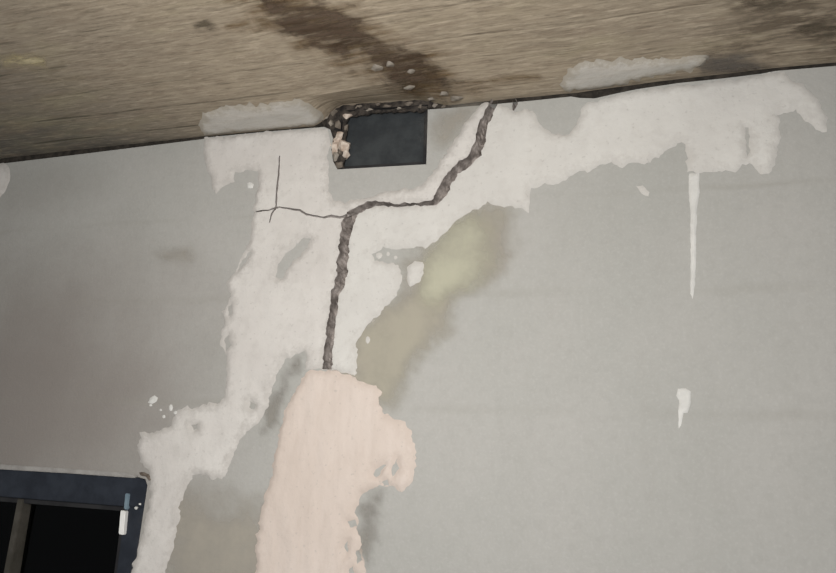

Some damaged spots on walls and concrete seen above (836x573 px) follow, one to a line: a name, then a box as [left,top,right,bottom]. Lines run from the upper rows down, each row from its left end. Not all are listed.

spalling [322,100,446,169]
damp [346,210,503,401]
crack [256,62,836,370]
damp [170,505,259,573]